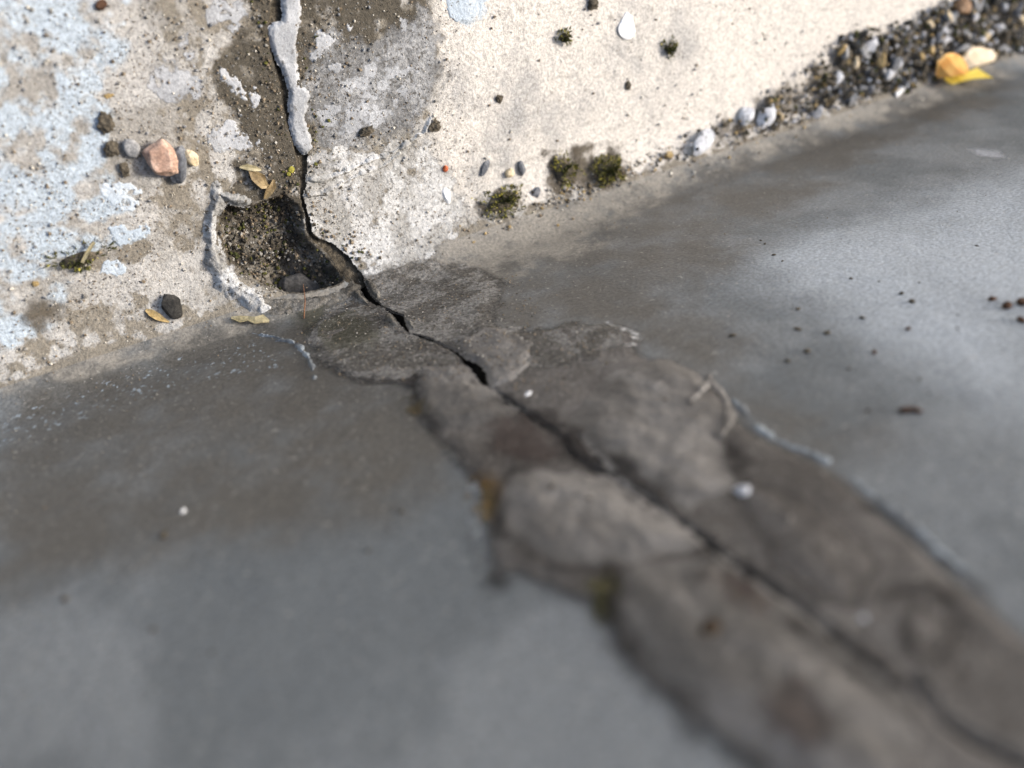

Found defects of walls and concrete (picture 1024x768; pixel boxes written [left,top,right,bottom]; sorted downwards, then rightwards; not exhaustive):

peeling [206,0,248,33]
peeling [147,33,203,103]
peeling [219,68,261,109]
peeling [268,0,418,155]
peeling [196,119,263,154]
crack [267,0,557,437]
spalling [216,190,346,295]
peeling [354,279,381,306]
peeling [385,313,416,330]